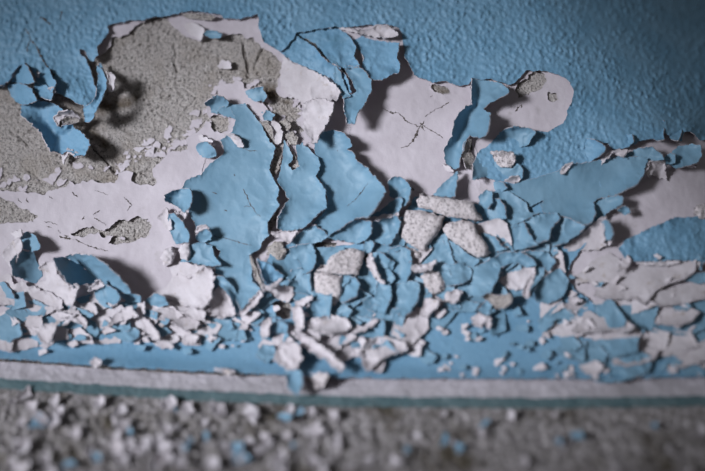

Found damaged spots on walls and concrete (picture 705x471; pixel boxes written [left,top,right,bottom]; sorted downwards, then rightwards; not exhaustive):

crack [383,95,449,148]
flaking render [0,11,705,383]
peeling [309,371,330,389]